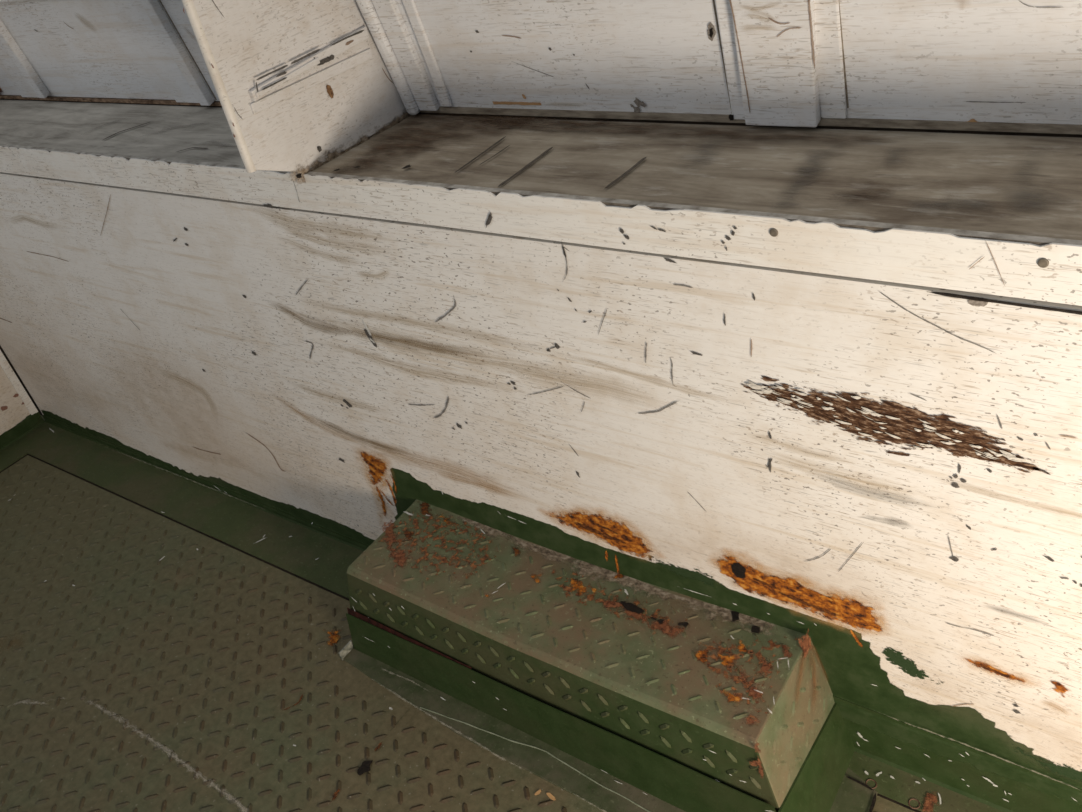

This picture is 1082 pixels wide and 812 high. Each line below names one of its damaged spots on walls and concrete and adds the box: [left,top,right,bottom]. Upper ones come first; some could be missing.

corrosion [361,452,812,724]
corrosion [715,553,883,647]